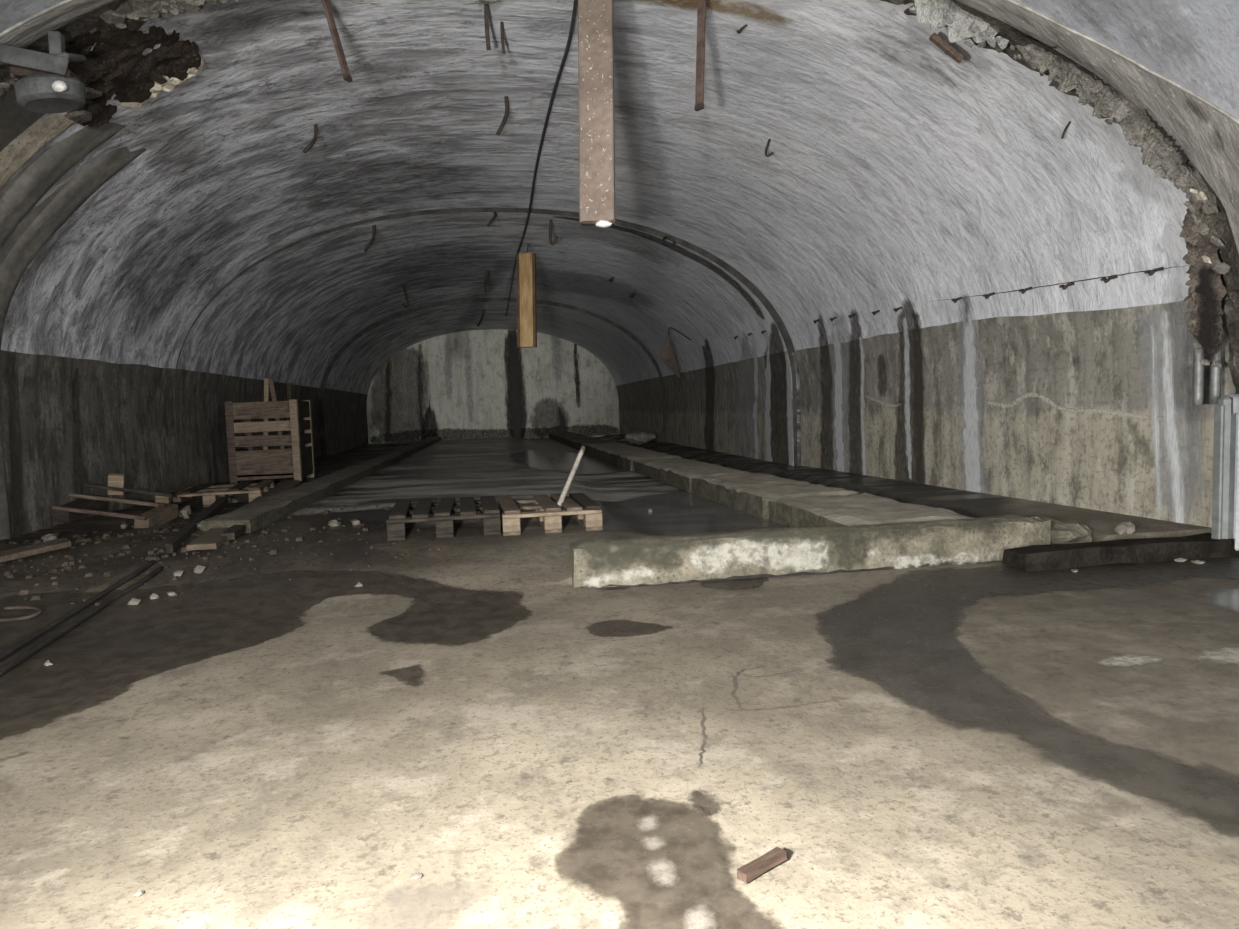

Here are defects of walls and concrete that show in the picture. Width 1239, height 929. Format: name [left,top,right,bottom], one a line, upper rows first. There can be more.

spalling [63,0,239,128]
corrosion [647,0,783,21]
spalling [909,0,1231,368]
damp [702,340,715,451]
damp [736,322,798,466]
damp [818,300,925,484]
damp [960,298,1202,523]
damp [0,570,532,739]
damp [587,620,671,637]
crack [697,666,847,767]
damp [817,552,1239,835]
damp [556,791,779,929]